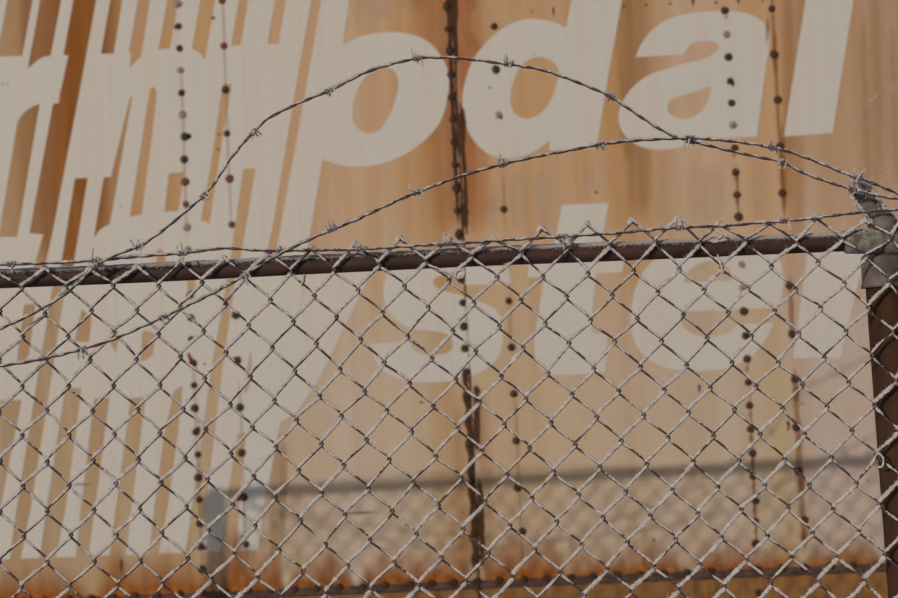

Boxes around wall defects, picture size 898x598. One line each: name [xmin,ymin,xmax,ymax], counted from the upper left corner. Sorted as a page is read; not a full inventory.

corrosion [444,0,469,241]
corrosion [579,562,678,576]
corrosion [701,559,794,571]
corrosion [104,559,211,596]
corrosion [224,570,281,591]
corrosion [293,573,350,588]
corrosion [365,571,464,585]
corrosion [0,587,80,598]